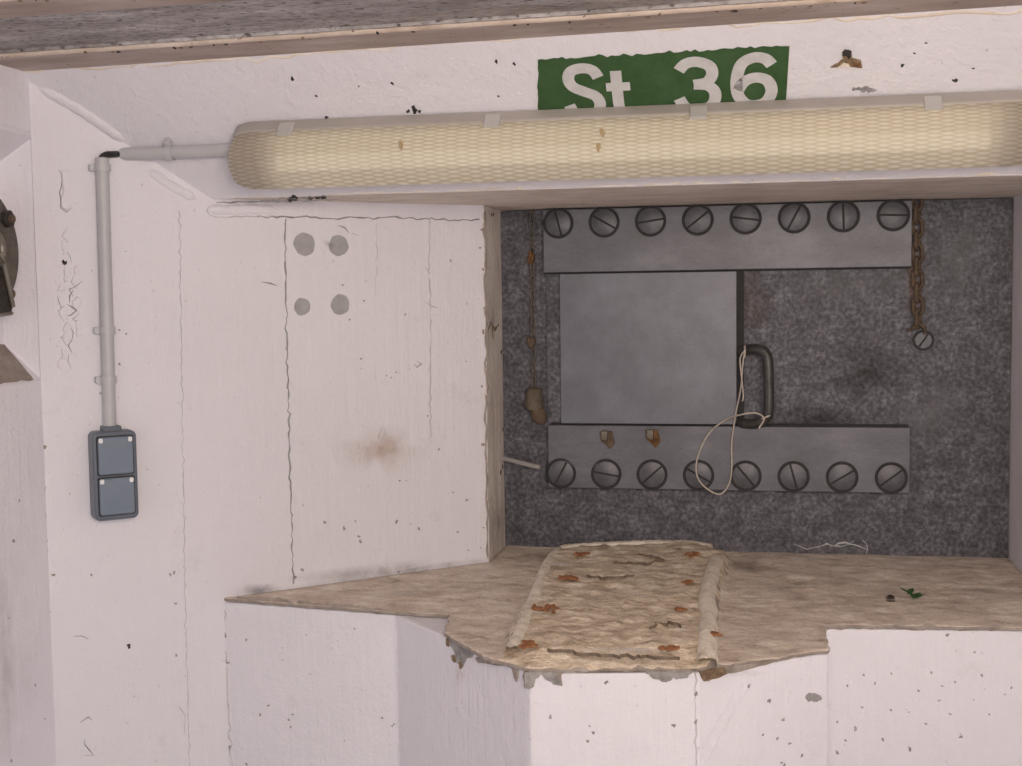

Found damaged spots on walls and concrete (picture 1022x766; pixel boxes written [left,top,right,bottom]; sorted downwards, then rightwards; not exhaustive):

corrosion [531,604,560,614]
corrosion [518,639,538,649]
spalling [446,637,563,689]
spalling [575,653,820,684]